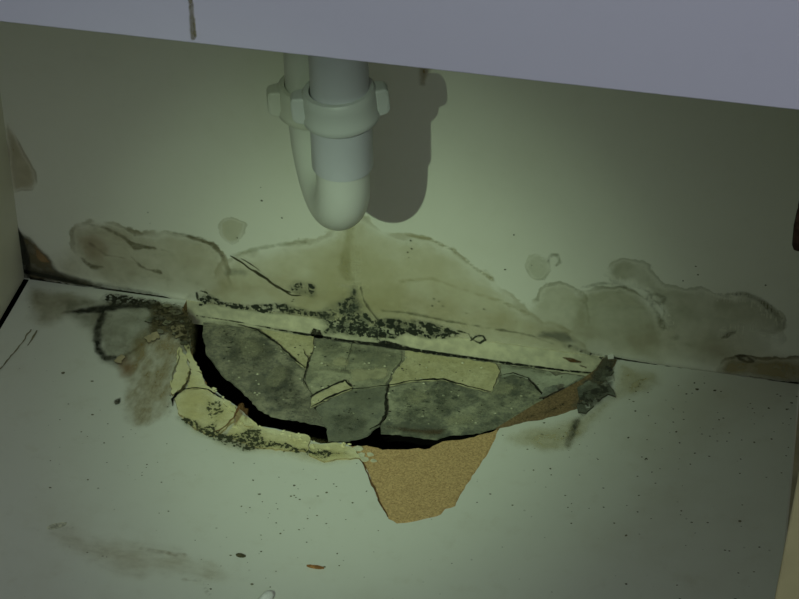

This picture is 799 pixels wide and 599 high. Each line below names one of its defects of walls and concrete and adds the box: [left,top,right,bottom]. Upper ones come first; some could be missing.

crack [171,352,240,432]
damp [18,228,616,420]
crack [238,324,490,429]
spalling [170,344,616,523]